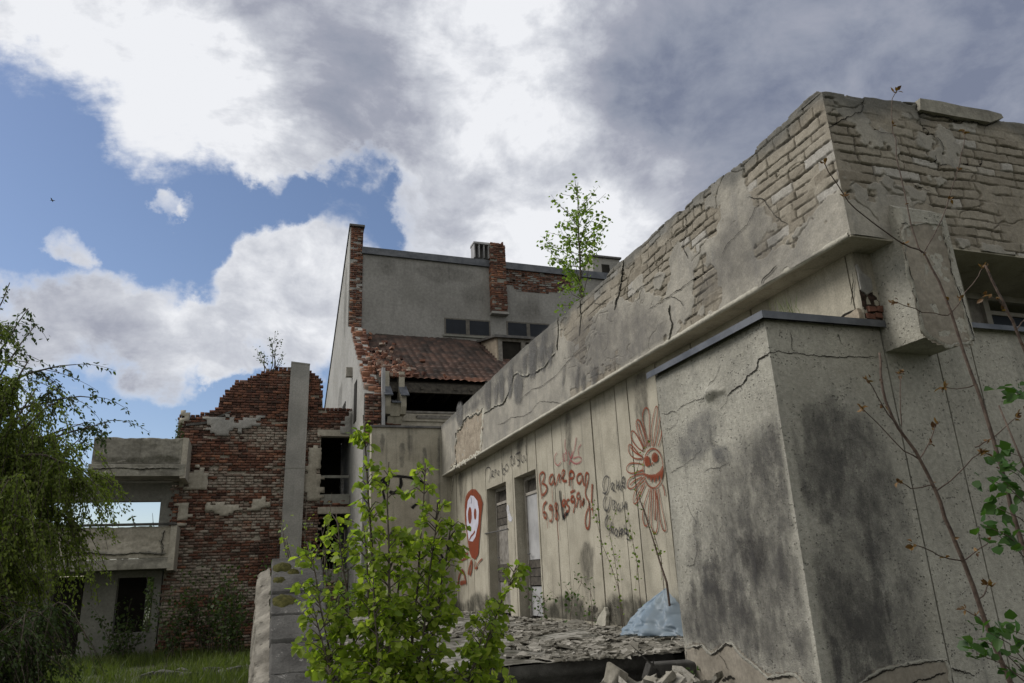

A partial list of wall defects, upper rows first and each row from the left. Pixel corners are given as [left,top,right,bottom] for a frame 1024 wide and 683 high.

spalling [841,264,883,320]
crack [451,213,707,494]
crack [661,333,874,429]
peeling [451,408,484,470]